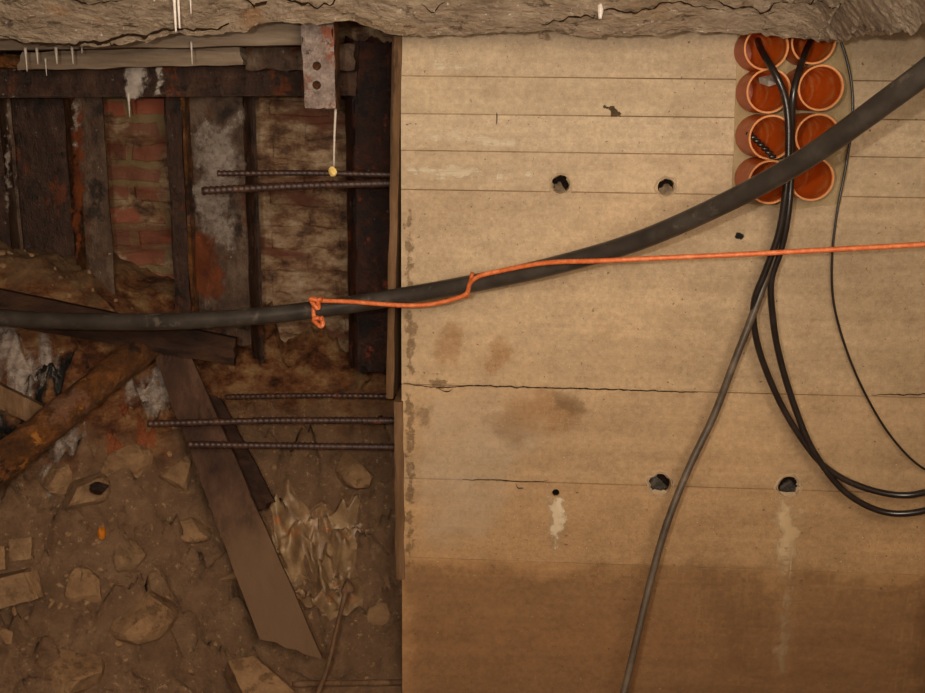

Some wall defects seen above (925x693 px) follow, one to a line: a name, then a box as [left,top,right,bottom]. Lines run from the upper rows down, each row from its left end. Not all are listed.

crack [75,0,121,8]
crack [245,0,335,9]
crack [542,0,841,25]
crack [0,23,229,47]
leakage [192,113,243,250]
leakage [536,496,567,560]
leakage [750,502,803,569]